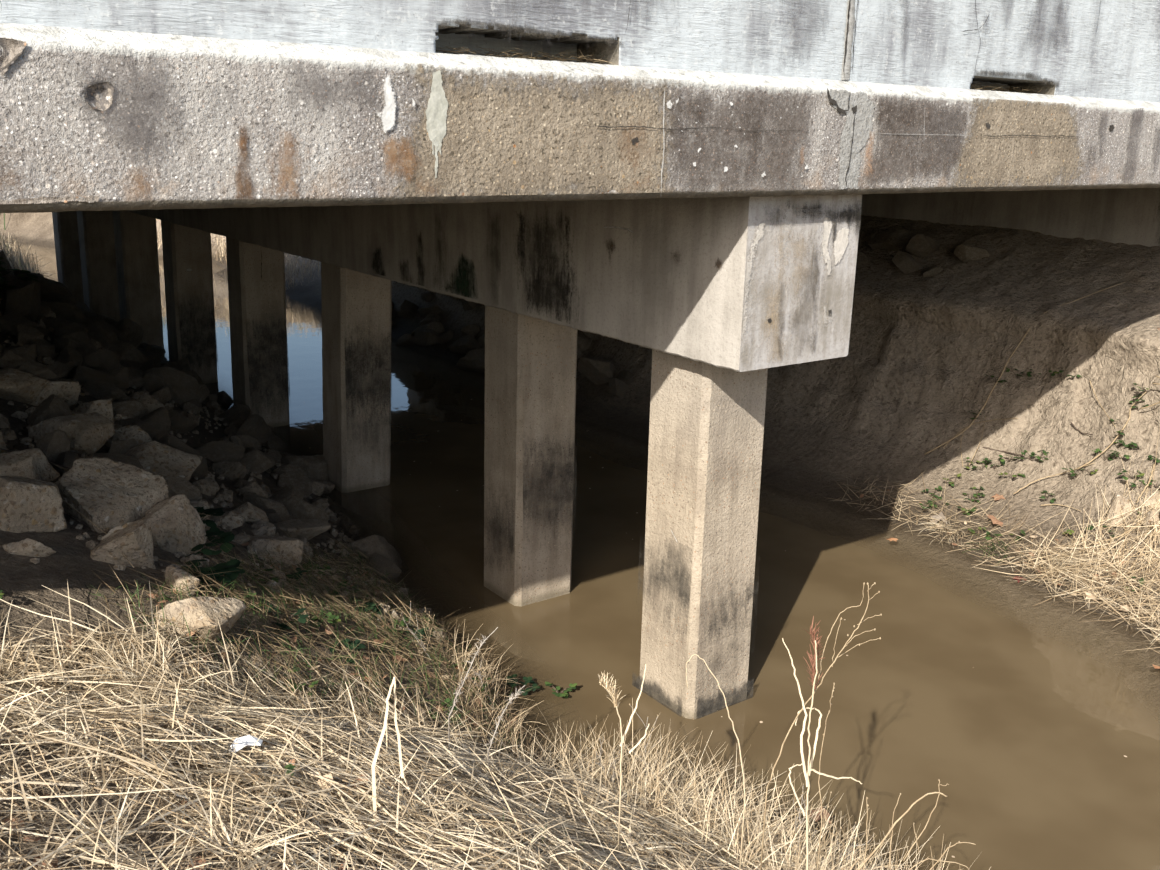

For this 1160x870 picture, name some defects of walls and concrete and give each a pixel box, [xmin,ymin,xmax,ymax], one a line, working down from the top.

spalling [0,38,27,75]
corrosion [236,127,253,198]
peeling [378,63,683,197]
crack [827,0,911,189]
crack [984,132,1083,140]
damp [518,215,573,315]
damp [512,446,577,524]
damp [639,551,690,606]
damp [632,675,682,715]
damp [696,679,754,719]